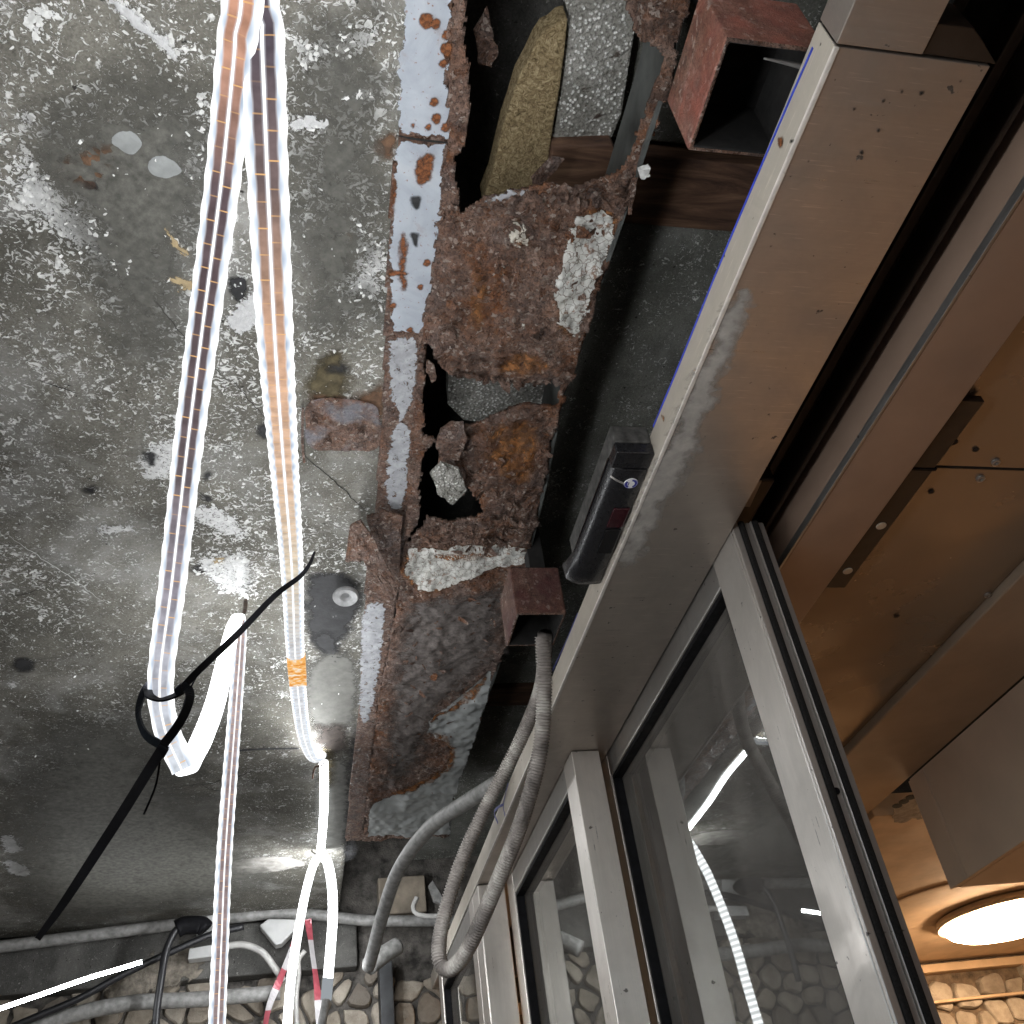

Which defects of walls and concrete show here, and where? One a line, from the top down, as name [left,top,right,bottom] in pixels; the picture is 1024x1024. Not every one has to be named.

rust [419,13,452,68]
rust [473,6,499,67]
rust [411,98,450,132]
rust [375,134,397,159]
rust [415,153,435,185]
peeling [485,189,529,202]
rust [389,234,423,291]
rust [426,156,651,394]
rust [312,387,384,419]
leakage [618,290,750,564]
rust [417,409,553,557]
rust [376,590,502,795]